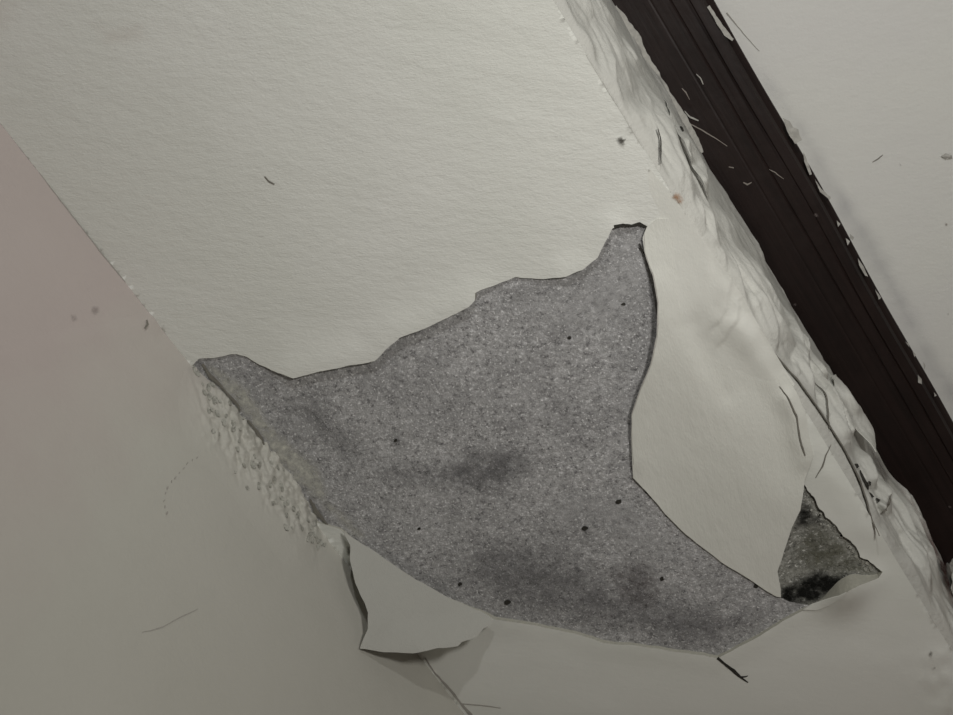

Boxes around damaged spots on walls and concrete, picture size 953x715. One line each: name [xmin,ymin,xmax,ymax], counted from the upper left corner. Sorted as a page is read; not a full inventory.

spalling [178,218,882,658]
crack [424,658,501,715]
crack [717,657,748,683]